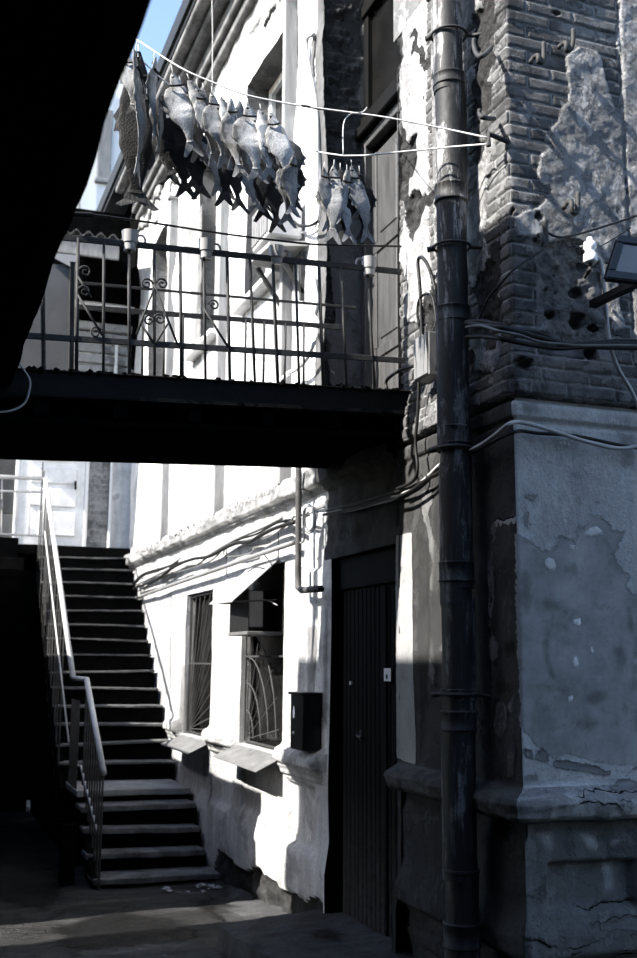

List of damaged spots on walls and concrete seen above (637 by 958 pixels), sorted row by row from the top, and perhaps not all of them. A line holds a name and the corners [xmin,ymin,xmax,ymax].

flaking render [399,263,437,443]
flaking render [425,0,437,294]
flaking render [462,0,637,416]
peeling [487,523,499,668]
peeling [508,497,637,791]
crack [522,895,637,955]